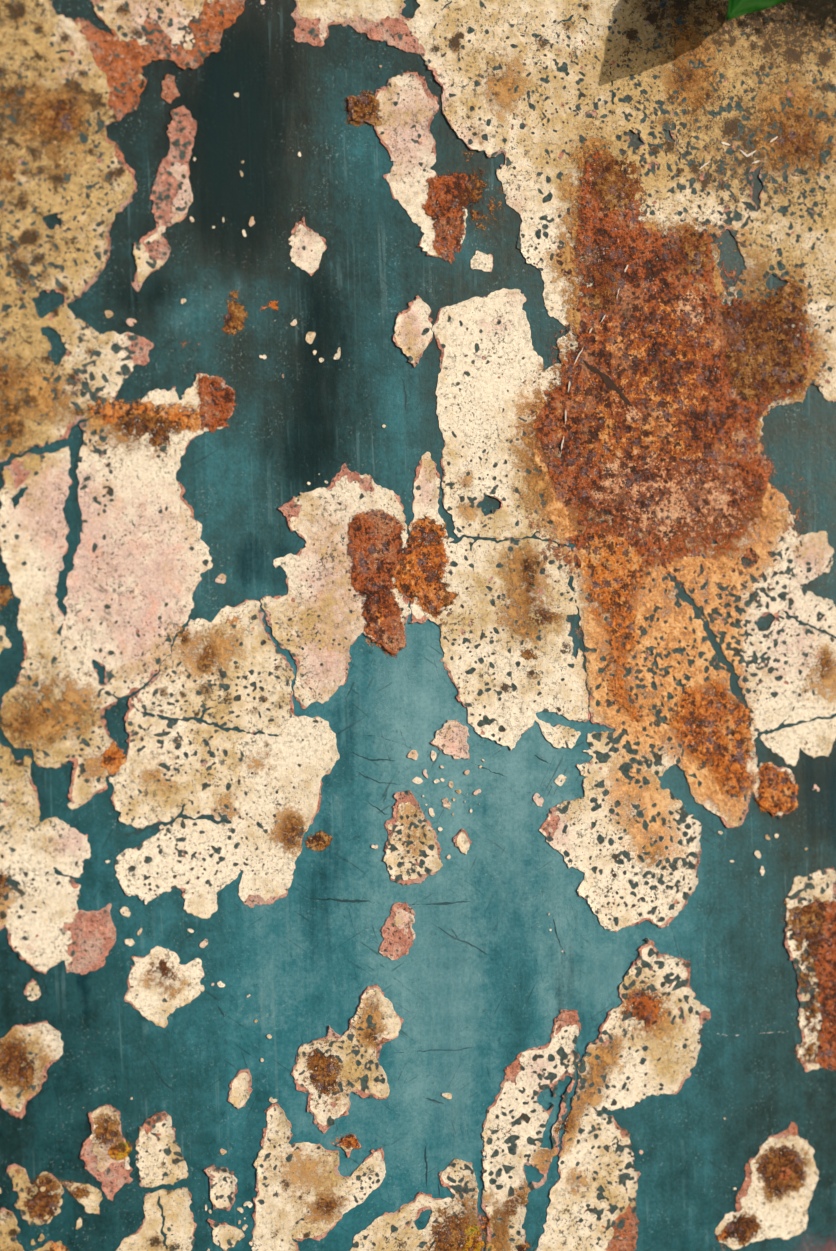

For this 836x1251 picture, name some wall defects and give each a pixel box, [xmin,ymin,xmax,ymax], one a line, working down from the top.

rust [0,355,236,457]
crack [126,702,279,737]
rust [347,509,459,657]
peeling [0,0,836,975]
crack [446,531,590,704]
rust [495,127,829,867]
crack [664,567,836,768]
peeling [124,939,225,1028]
rust [783,895,836,1071]
peeling [784,867,836,1072]
peeling [350,938,711,1251]
peeling [714,1121,819,1250]